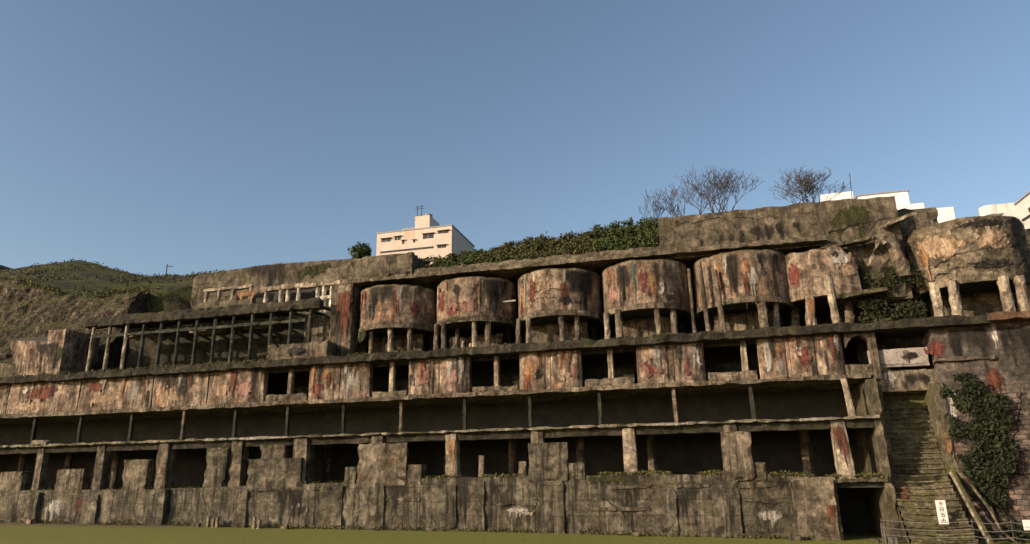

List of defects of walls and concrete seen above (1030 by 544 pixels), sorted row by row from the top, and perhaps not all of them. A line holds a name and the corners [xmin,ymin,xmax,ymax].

corrosion [741,258,751,304]
corrosion [524,352,542,398]
water stain [276,480,302,518]
water stain [390,477,409,519]